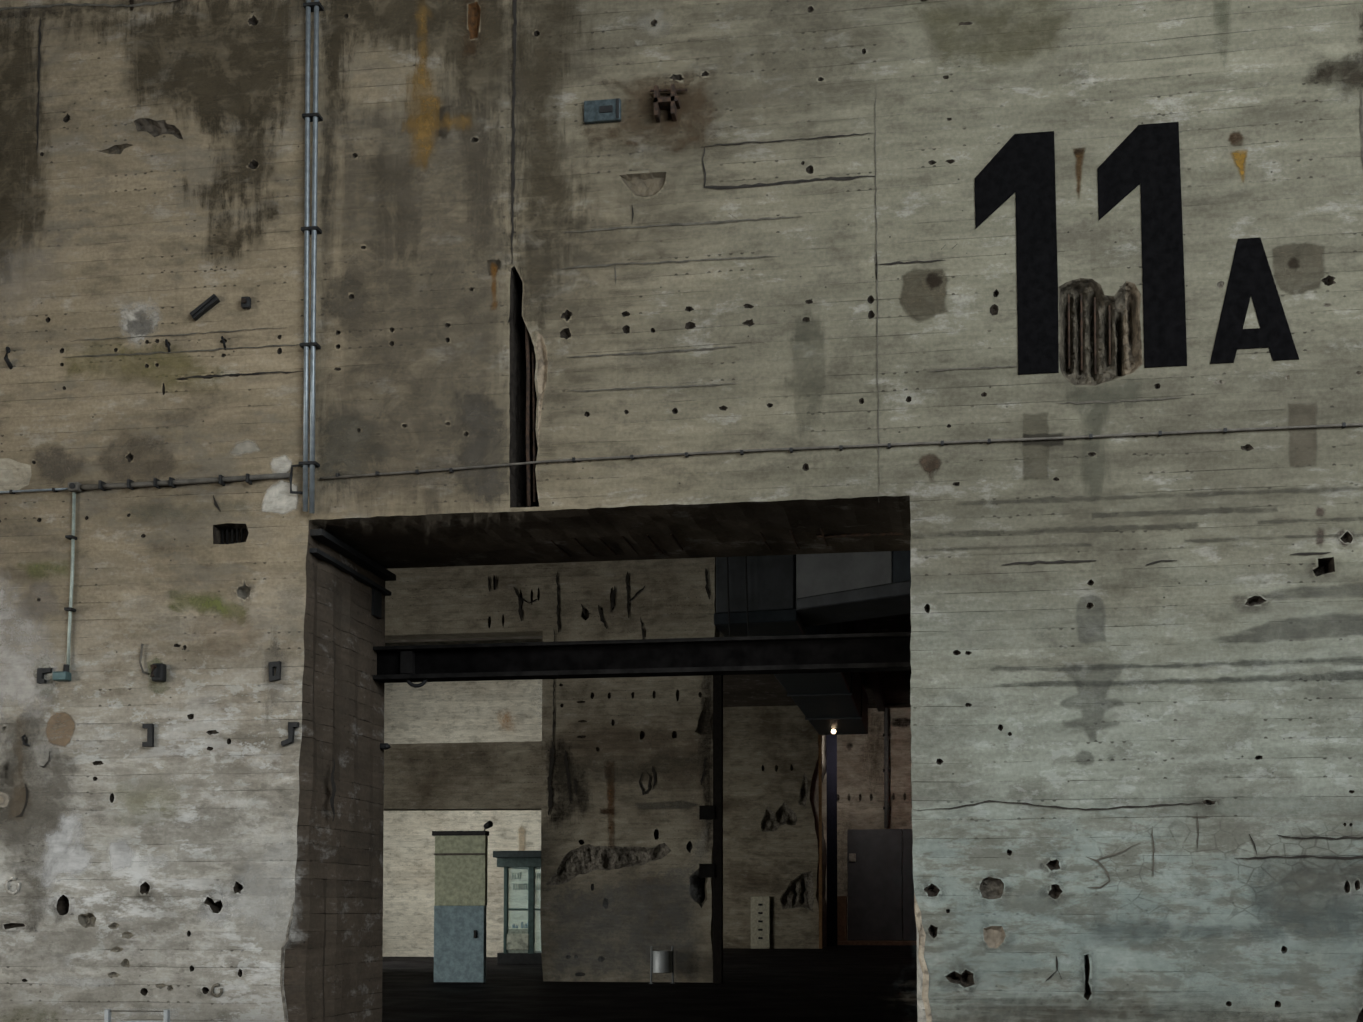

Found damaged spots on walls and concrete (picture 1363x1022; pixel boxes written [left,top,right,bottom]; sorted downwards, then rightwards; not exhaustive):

water stain [0,11,48,281]
water stain [68,0,303,258]
water stain [1309,54,1363,88]
spalling [1058,278,1143,386]